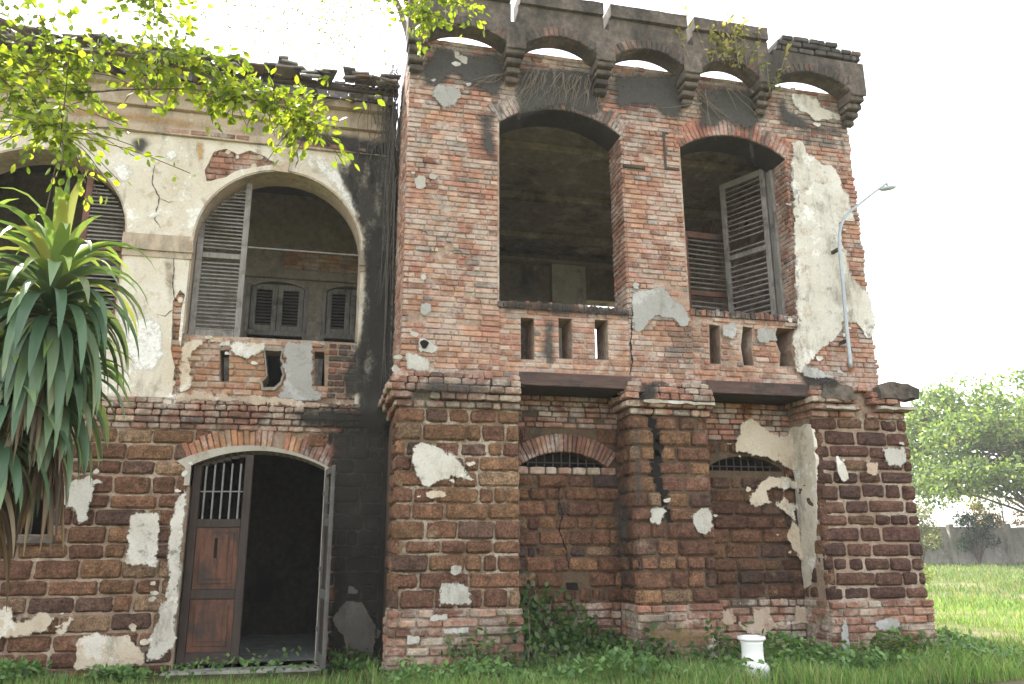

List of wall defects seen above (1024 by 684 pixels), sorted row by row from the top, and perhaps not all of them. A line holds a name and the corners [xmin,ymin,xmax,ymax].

peeling [790,87,841,127]
crack [152,166,174,228]
peeling [126,291,348,410]
water stain [279,131,397,664]
peeling [631,282,691,338]
peeling [786,140,876,379]
peeling [0,606,74,638]
peeling [73,462,193,676]
peeling [412,442,475,499]
crack [557,485,569,568]
crack [645,407,673,523]
peeling [727,418,819,590]